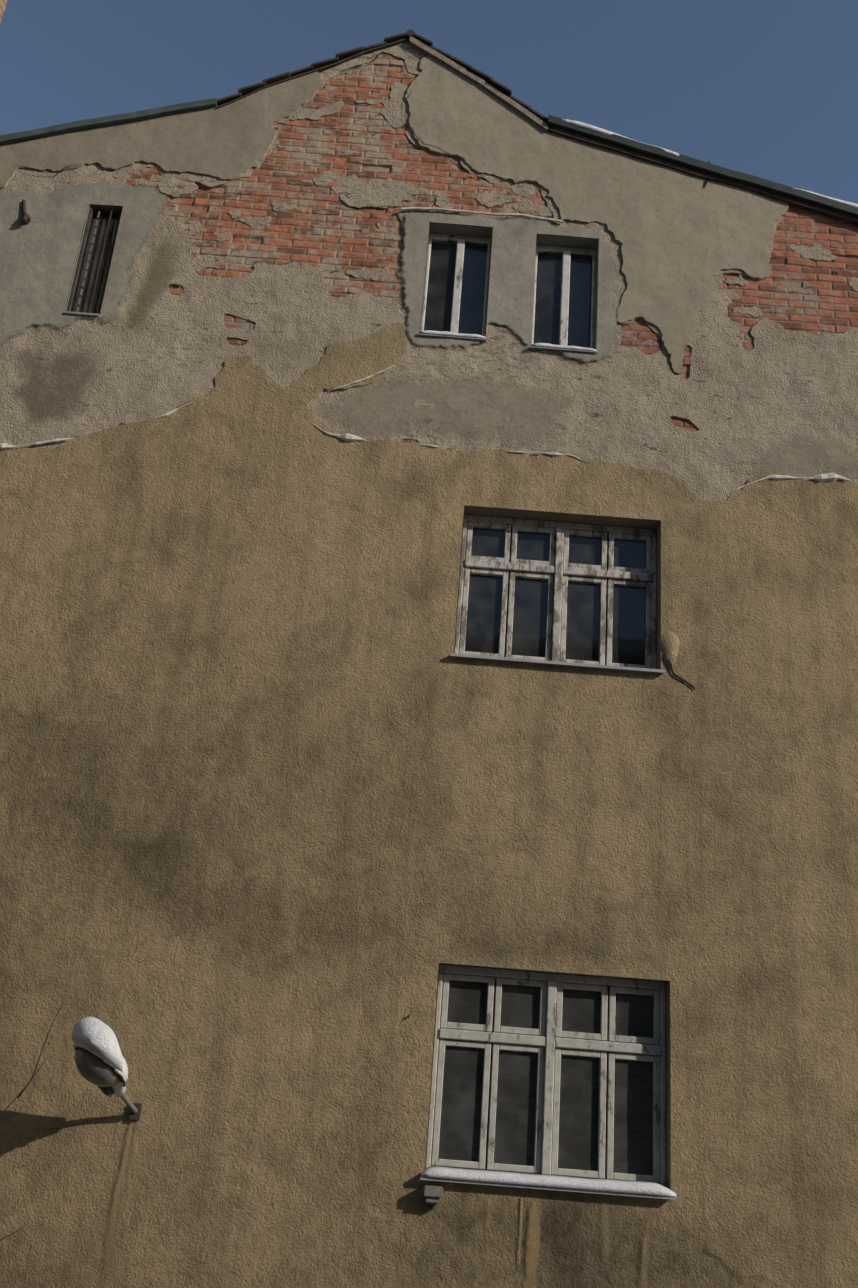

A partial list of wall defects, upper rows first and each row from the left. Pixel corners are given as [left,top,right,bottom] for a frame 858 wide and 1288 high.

flaking render [0,41,858,502]
crack [664,653,696,690]